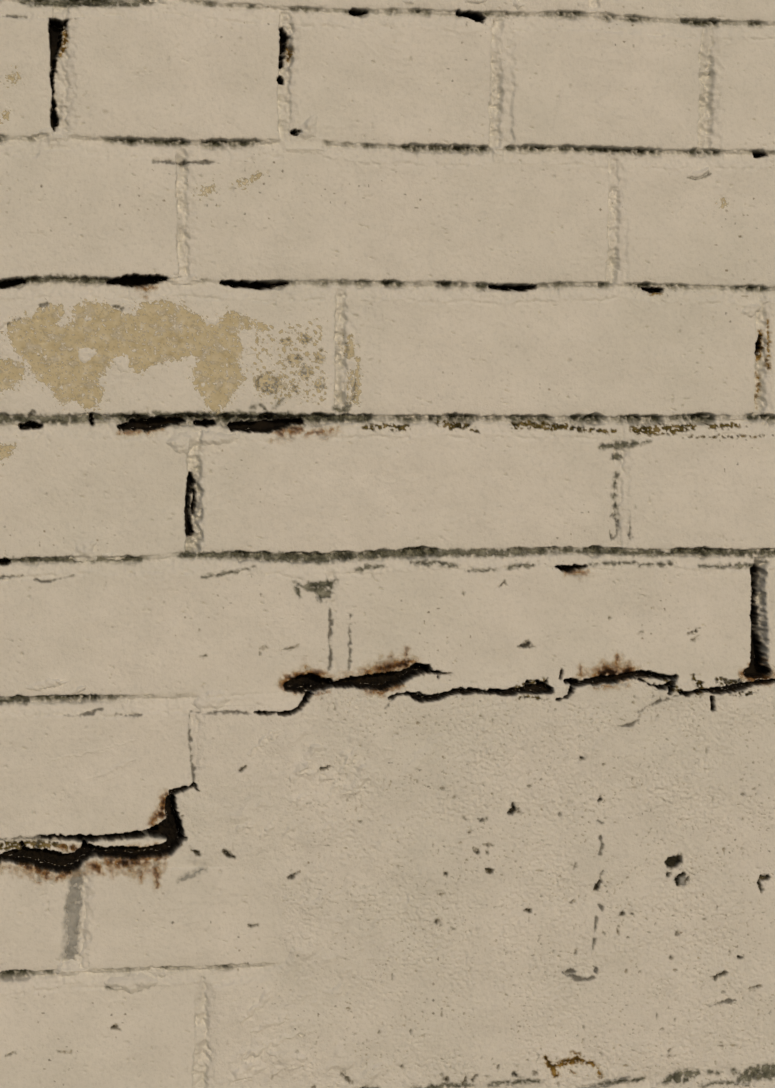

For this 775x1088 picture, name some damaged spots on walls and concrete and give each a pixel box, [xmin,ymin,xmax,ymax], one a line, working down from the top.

peeling [0,298,327,414]
peeling [343,334,361,405]
rust [366,652,415,674]
crack [388,670,775,711]
rust [579,654,634,688]
rust [149,792,168,826]
rust [0,840,78,851]
rust [87,844,167,888]